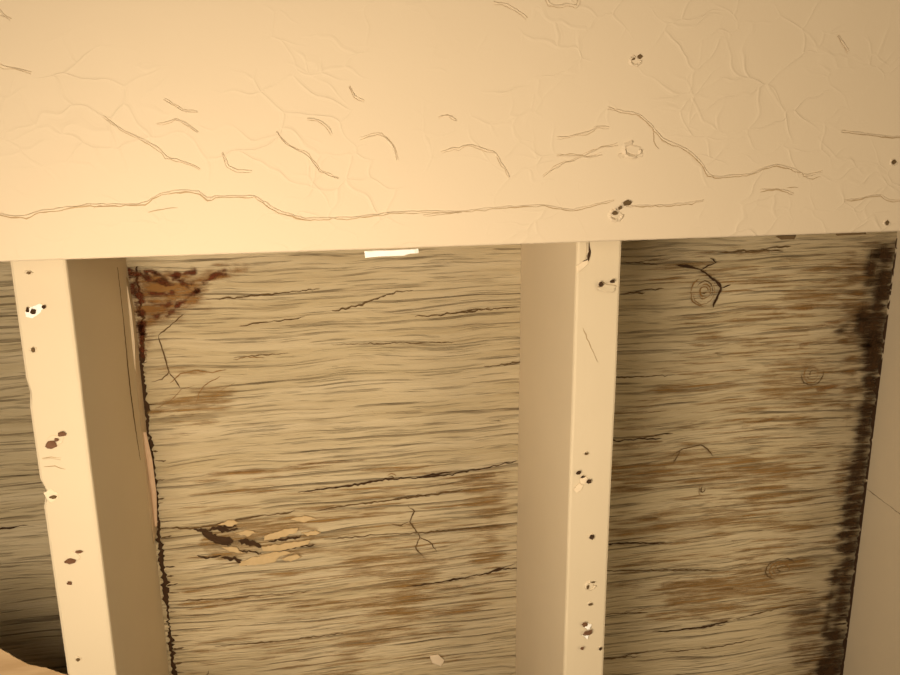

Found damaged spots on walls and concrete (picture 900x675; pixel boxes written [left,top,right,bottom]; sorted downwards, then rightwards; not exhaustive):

crack [0,98,704,221]
crack [546,107,823,195]
crack [843,130,900,139]
crack [844,194,900,202]
spalling [364,248,419,258]
spalling [25,304,46,318]
peeling [127,286,136,371]
corrosion [128,264,239,358]
spalling [45,432,66,449]
crack [117,266,517,675]
leakage [611,244,895,675]
spalling [193,515,321,566]